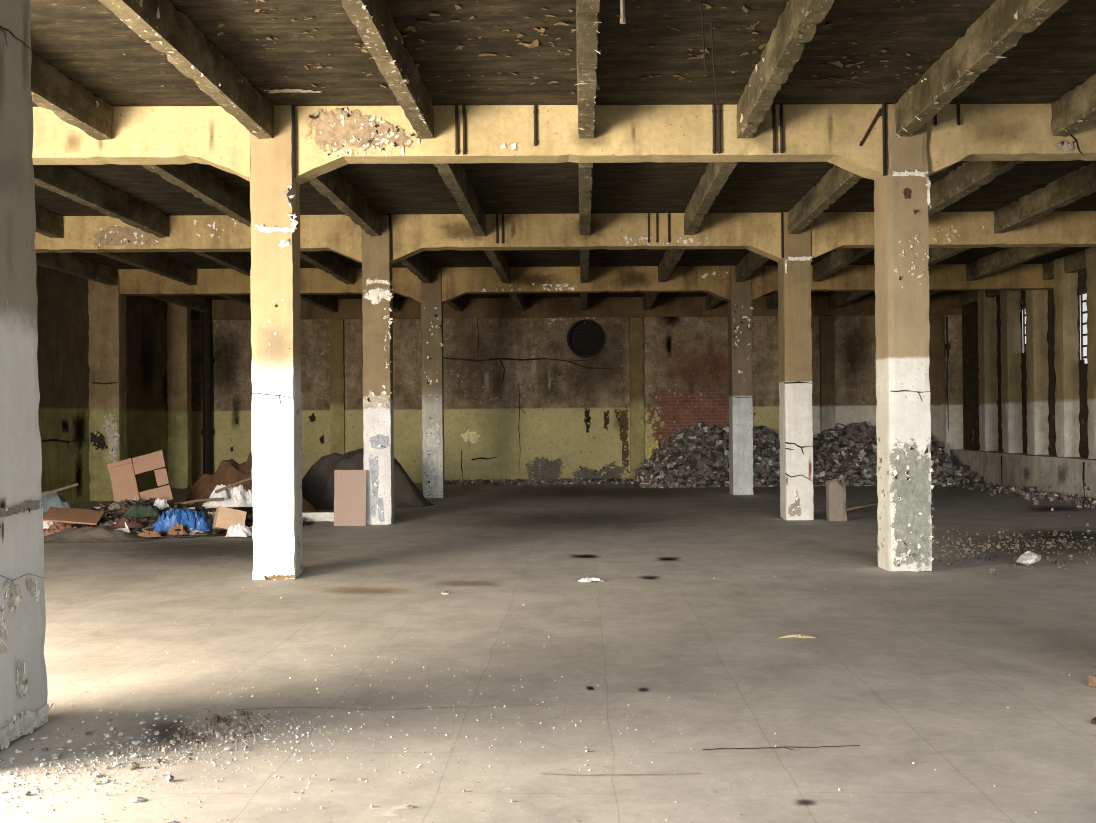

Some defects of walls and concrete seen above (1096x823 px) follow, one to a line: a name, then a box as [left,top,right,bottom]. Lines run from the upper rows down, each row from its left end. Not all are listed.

peeling [496,8,576,56]
peeling [305,5,475,157]
peeling [255,183,298,256]
peeling [364,278,393,372]
flaking render [644,383,729,459]
spalling [0,498,46,528]
peeling [0,578,41,659]
spalling [0,660,56,750]